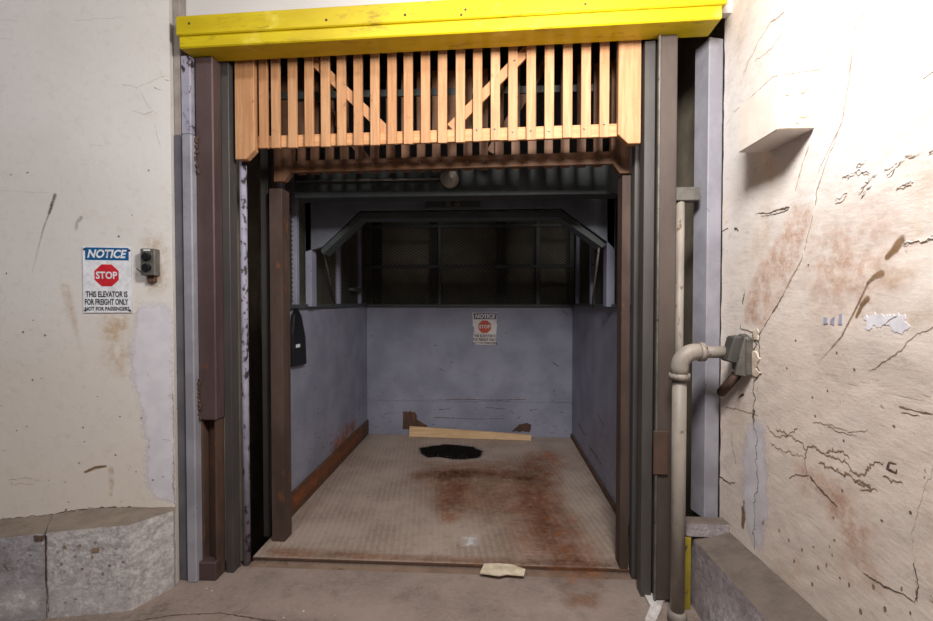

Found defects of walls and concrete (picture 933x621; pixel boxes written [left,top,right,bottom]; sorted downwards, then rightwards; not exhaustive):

crack [734,0,873,116]
spalling [835,149,933,204]
corrosion [885,236,904,259]
corrosion [832,270,884,347]
crack [871,327,933,370]
crack [718,334,933,603]
corrosion [417,455,618,573]